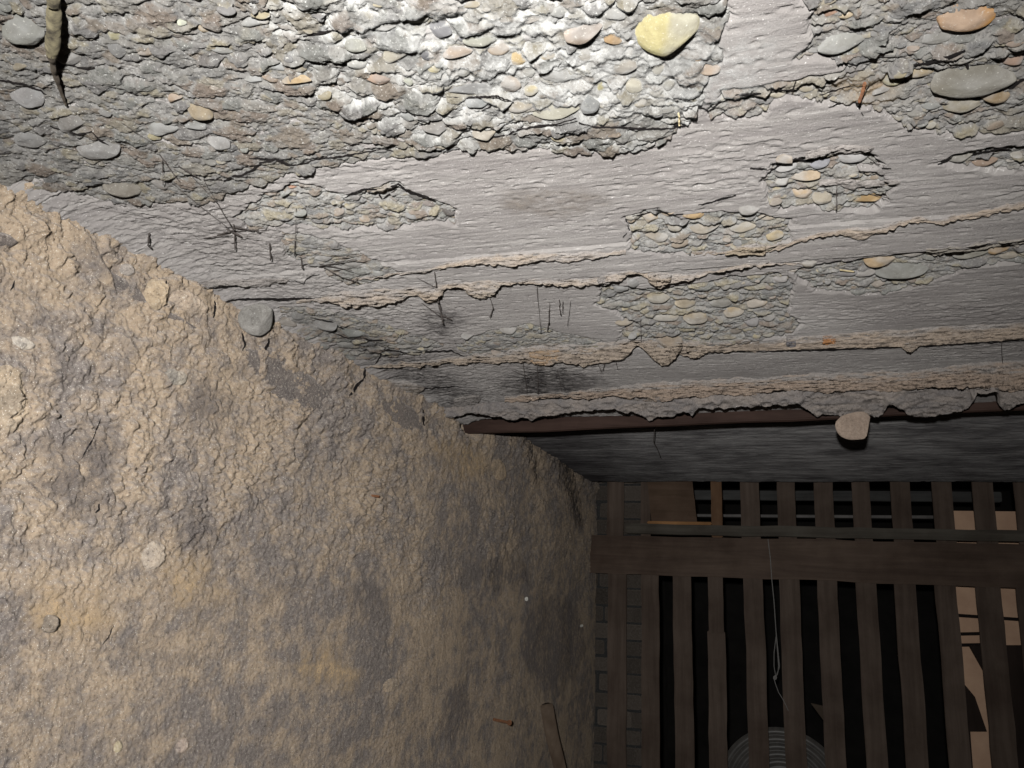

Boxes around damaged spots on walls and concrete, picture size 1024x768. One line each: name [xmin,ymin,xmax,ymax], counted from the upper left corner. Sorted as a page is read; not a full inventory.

spalling [0,0,1024,286]
spalling [279,243,1024,395]
spalling [435,387,1024,421]